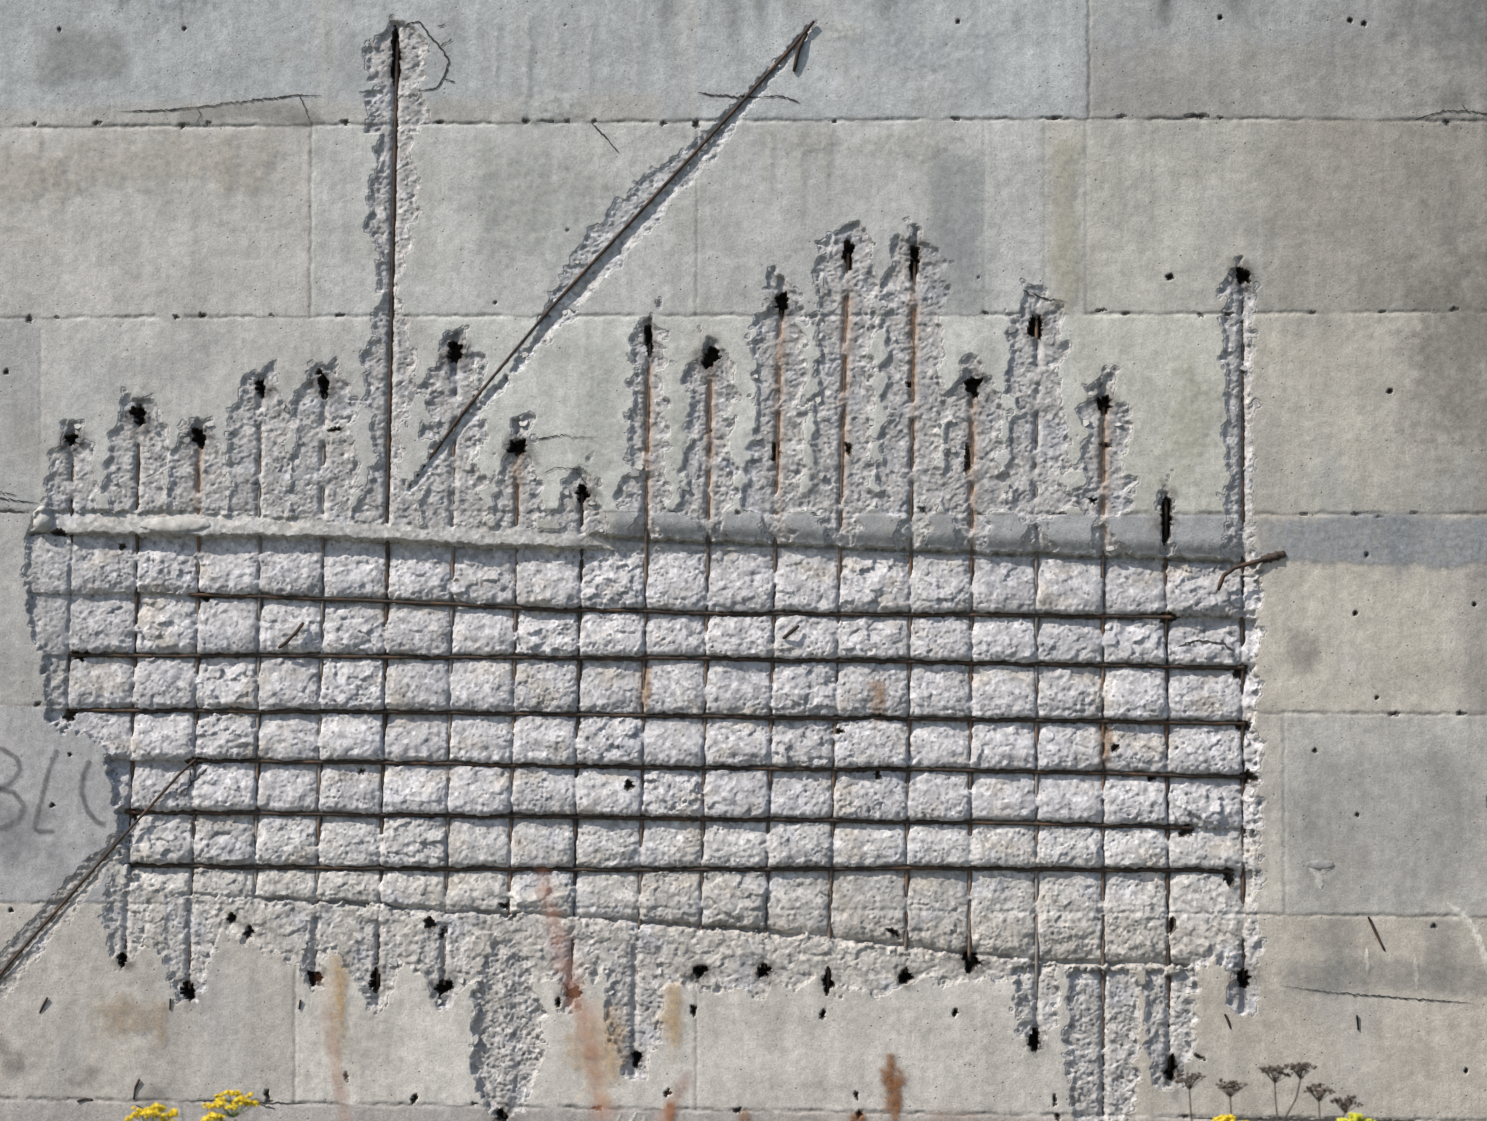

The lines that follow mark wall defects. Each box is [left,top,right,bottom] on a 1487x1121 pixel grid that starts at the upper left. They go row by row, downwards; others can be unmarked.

spalling [69,708,1246,725]
spalling [146,759,1246,830]
spalling [124,811,144,825]
spalling [129,863,1233,873]
spalling [1223,873,1235,888]
corrosion [881,1054,905,1121]